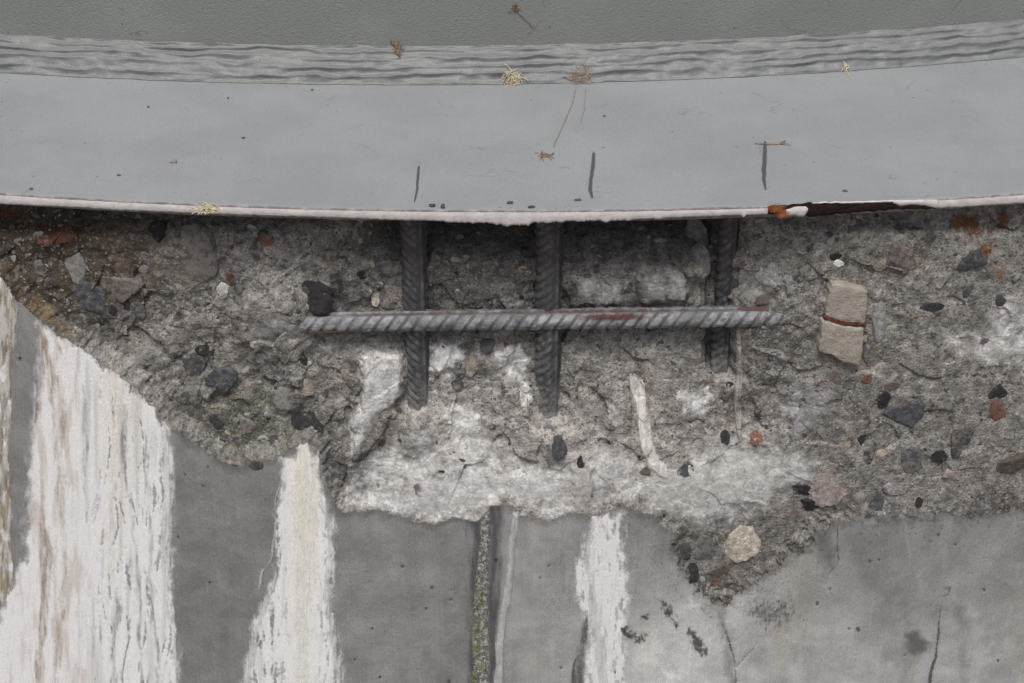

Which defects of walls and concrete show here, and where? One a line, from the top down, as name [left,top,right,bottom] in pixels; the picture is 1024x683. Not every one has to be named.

rust [769,204,788,218]
damp [0,278,180,683]
damp [244,443,344,683]
spalling [0,199,1024,608]
damp [345,334,824,683]
crack [928,588,950,683]